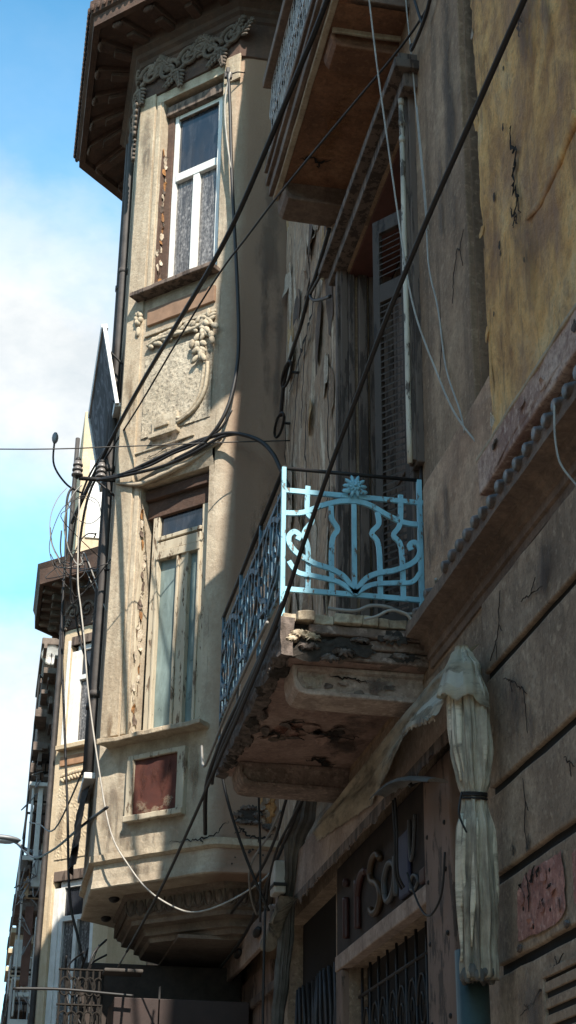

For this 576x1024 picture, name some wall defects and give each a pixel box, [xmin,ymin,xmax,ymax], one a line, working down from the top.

peeling [154,149,168,283]
crack [509,125,521,228]
flaking render [215,221,421,779]
peeling [128,509,147,734]
crack [490,577,542,733]
crack [170,823,274,844]